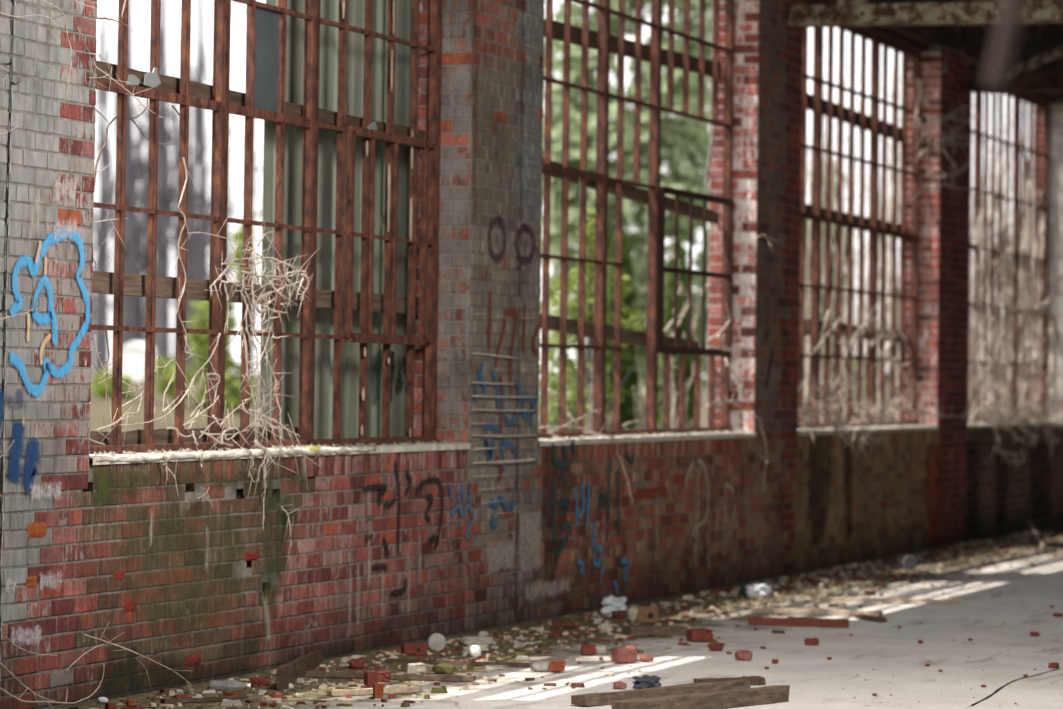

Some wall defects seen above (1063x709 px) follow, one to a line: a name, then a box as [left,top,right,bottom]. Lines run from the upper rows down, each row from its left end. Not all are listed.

crack [0,0,20,681]
peeling [54,182,75,200]